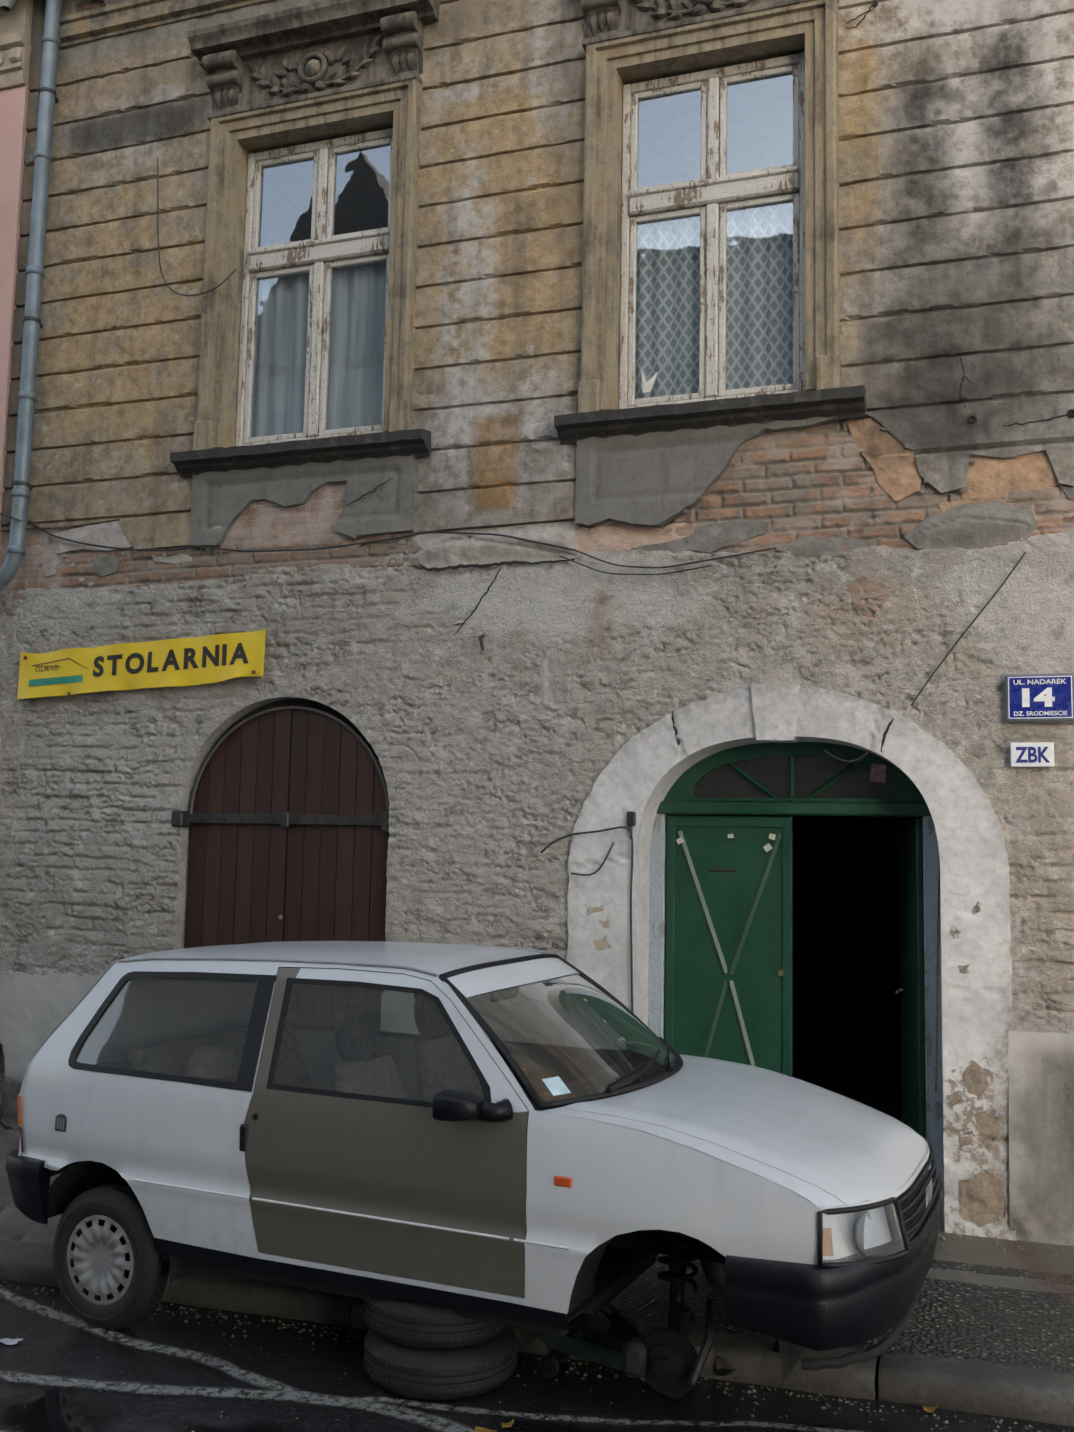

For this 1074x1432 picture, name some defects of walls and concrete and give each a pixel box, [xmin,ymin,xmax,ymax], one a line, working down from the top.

crack [846,0,878,29]
flaking render [572,411,1074,557]
flaking render [0,482,422,600]
peeling [944,1060,1000,1152]
peeling [959,1169,1006,1227]